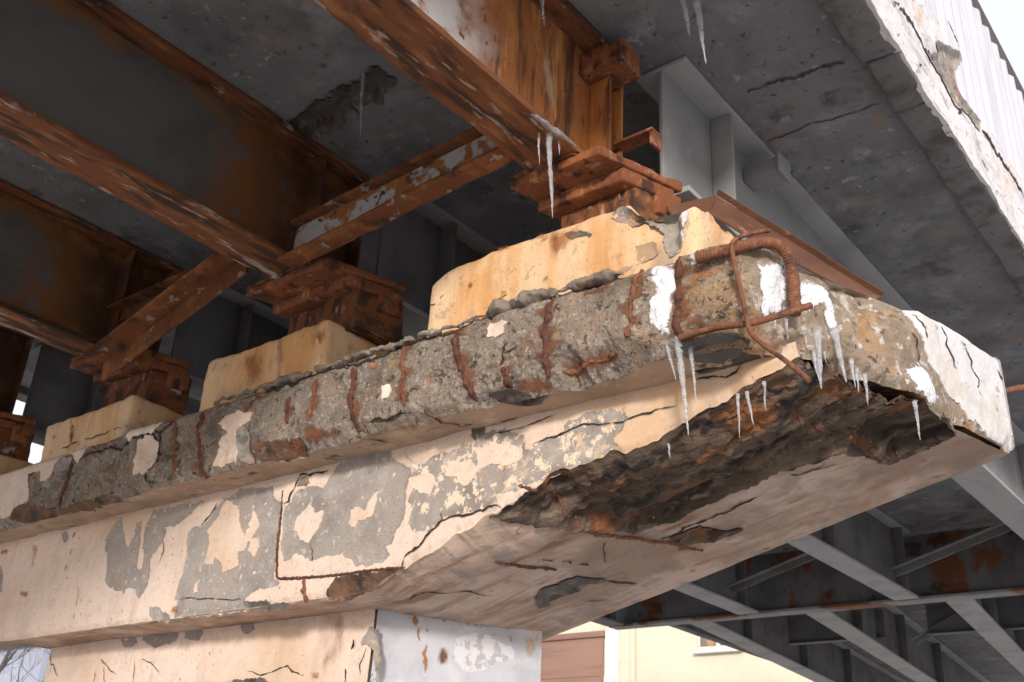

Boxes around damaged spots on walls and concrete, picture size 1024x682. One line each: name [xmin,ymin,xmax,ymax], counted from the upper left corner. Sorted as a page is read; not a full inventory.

crack [891,0,932,66]
spalling [288,66,396,139]
spalling [927,40,981,131]
crack [982,129,1023,193]
rust [552,233,572,251]
rust [519,379,552,392]
crack [912,314,1006,400]
rust [305,426,336,442]
spalling [105,206,956,648]
crack [487,405,676,443]
crack [401,504,500,568]
peeling [452,622,517,672]